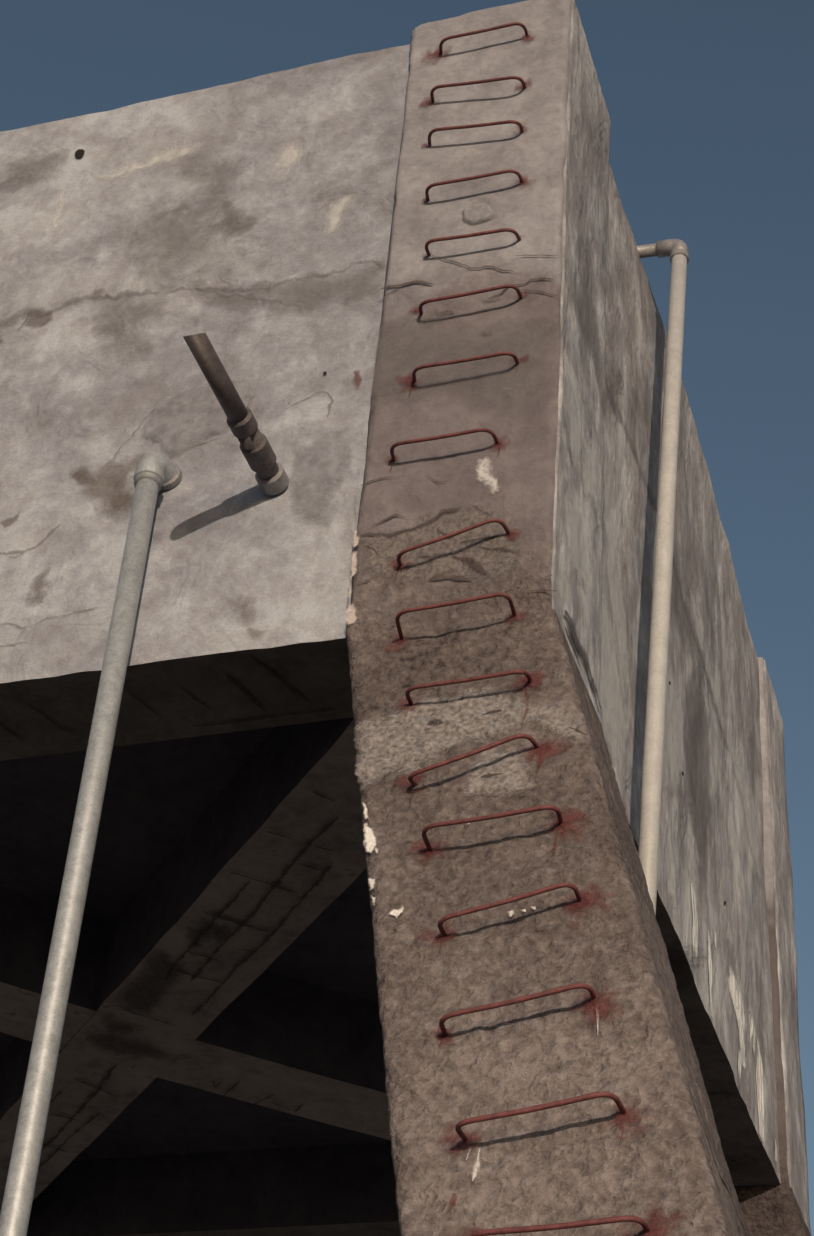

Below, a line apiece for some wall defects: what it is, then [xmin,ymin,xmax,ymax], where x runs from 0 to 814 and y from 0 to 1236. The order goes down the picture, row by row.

spalling [346,503,518,624]
spalling [356,689,588,794]
peeling [363,803,378,853]
damp [668,884,716,1018]
efflorescence [728,968,777,1162]